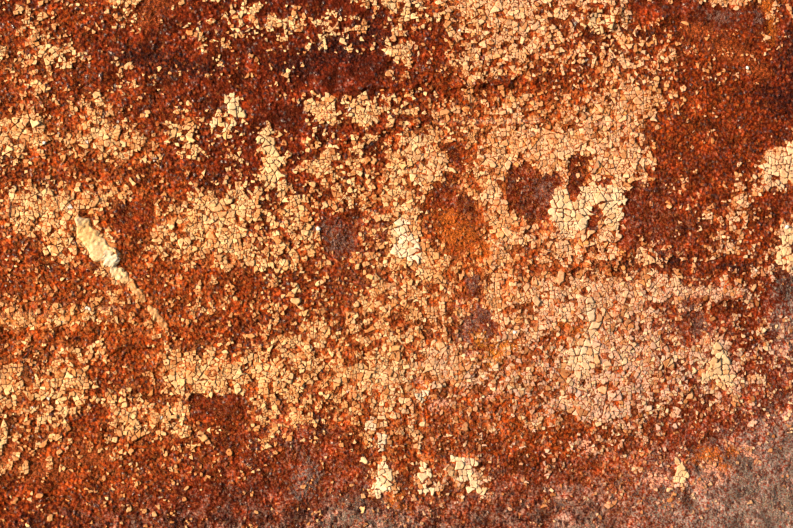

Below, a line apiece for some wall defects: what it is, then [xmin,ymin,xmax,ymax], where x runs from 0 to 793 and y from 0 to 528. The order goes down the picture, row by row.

corrosion [0,1,64,85]
peeling [182,0,370,54]
peeling [696,31,739,94]
peeling [698,0,793,36]
corrosion [0,94,137,192]
peeling [0,261,141,346]
peeling [178,276,242,332]
corrosion [250,0,775,528]
peeling [750,217,793,297]
corrosion [0,398,200,485]
peeling [102,462,175,523]
corrosion [692,446,791,525]